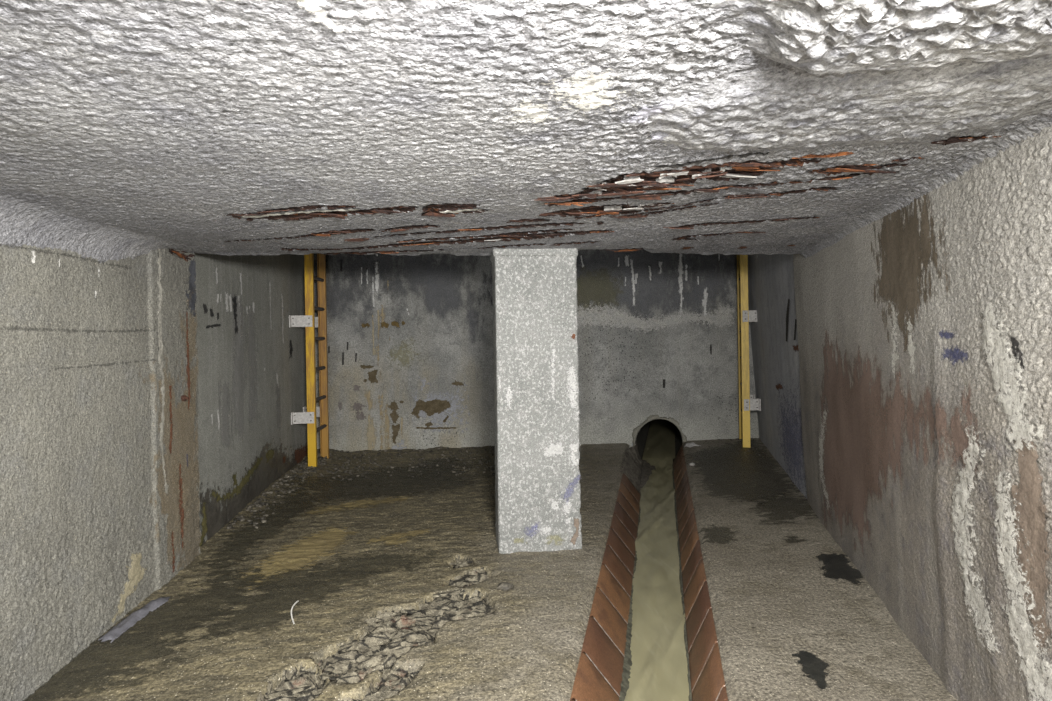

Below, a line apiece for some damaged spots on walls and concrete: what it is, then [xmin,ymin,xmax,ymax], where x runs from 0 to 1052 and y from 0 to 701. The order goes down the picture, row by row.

spalling [931,135,1001,146]
spalling [224,152,925,255]
damp [576,249,737,333]
peeling [388,399,456,444]